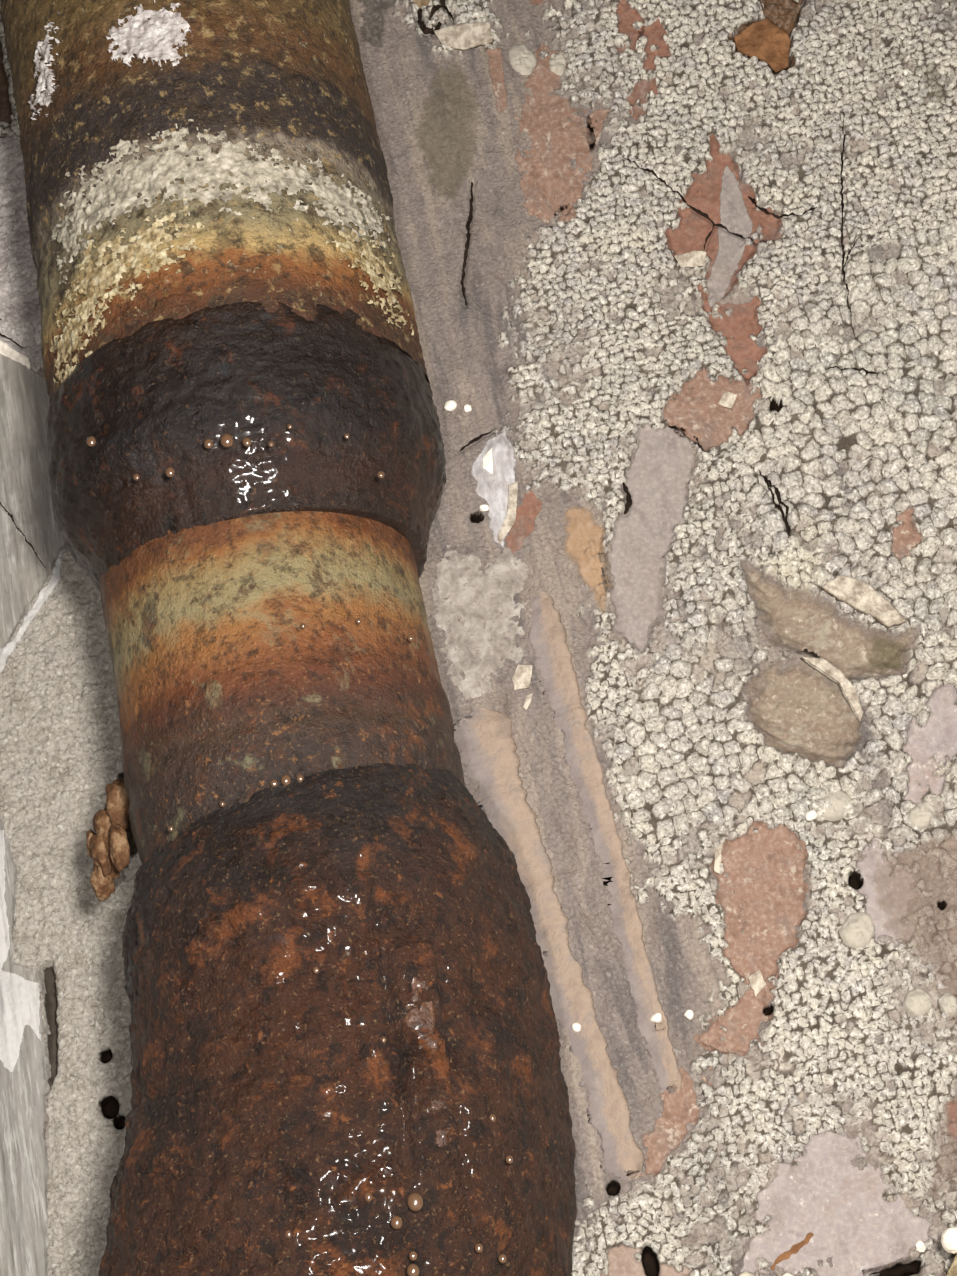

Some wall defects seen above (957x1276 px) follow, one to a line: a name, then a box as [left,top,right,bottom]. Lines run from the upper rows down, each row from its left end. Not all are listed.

crack [417,0,454,35]
peeling [616,0,671,121]
spalling [728,0,806,74]
crack [460,182,473,305]
crack [622,108,887,375]
peeling [606,134,783,653]
crack [0,502,46,568]
peeling [0,341,66,673]
flaking render [432,429,542,710]
spalling [746,570,911,765]
peeling [0,817,51,1276]
peeling [741,1131,930,1276]